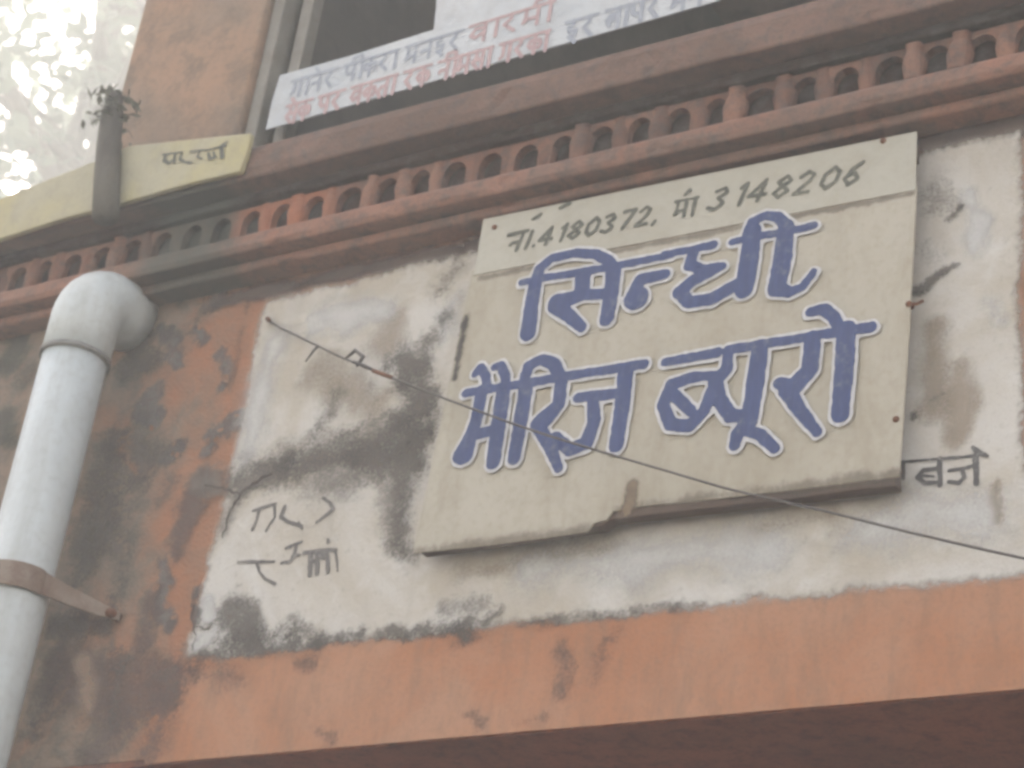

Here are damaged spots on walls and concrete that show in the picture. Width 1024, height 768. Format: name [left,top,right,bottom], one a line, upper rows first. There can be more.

water stain [912,263,959,296]
crack [204,473,273,538]
water stain [27,425,501,768]
water stain [223,299,469,556]